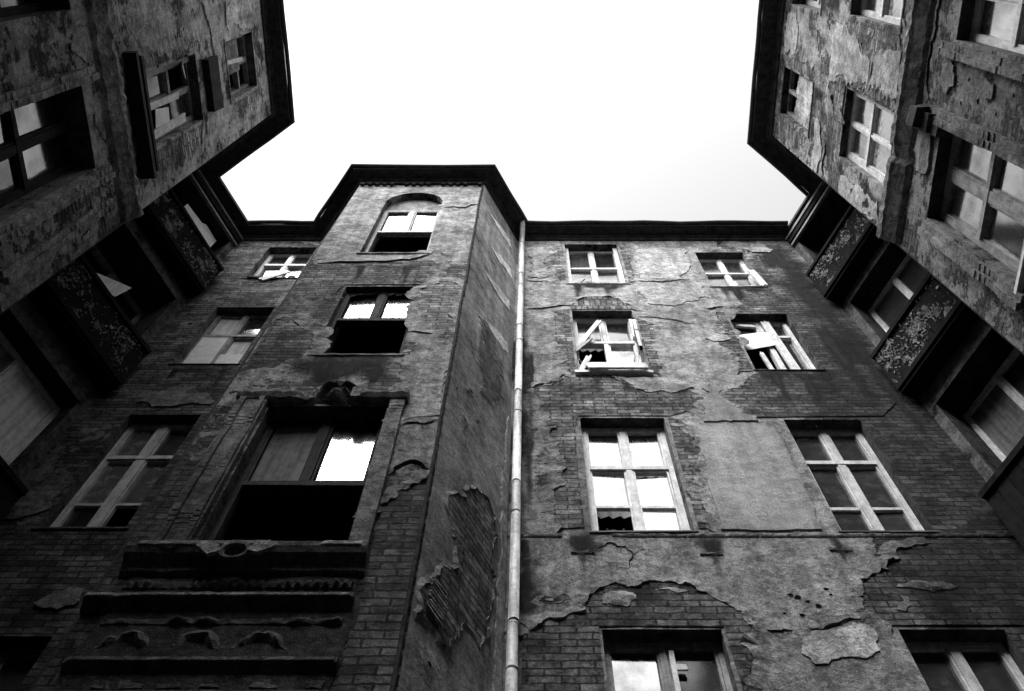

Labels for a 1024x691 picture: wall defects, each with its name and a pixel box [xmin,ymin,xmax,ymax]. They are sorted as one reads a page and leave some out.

spalling [782,20,903,124]
spalling [777,111,810,158]
spalling [231,259,465,379]
crack [526,278,571,309]
crack [637,303,723,323]
spalling [522,276,956,534]
spalling [336,468,498,691]
crack [591,530,647,568]
spalling [504,533,1024,691]